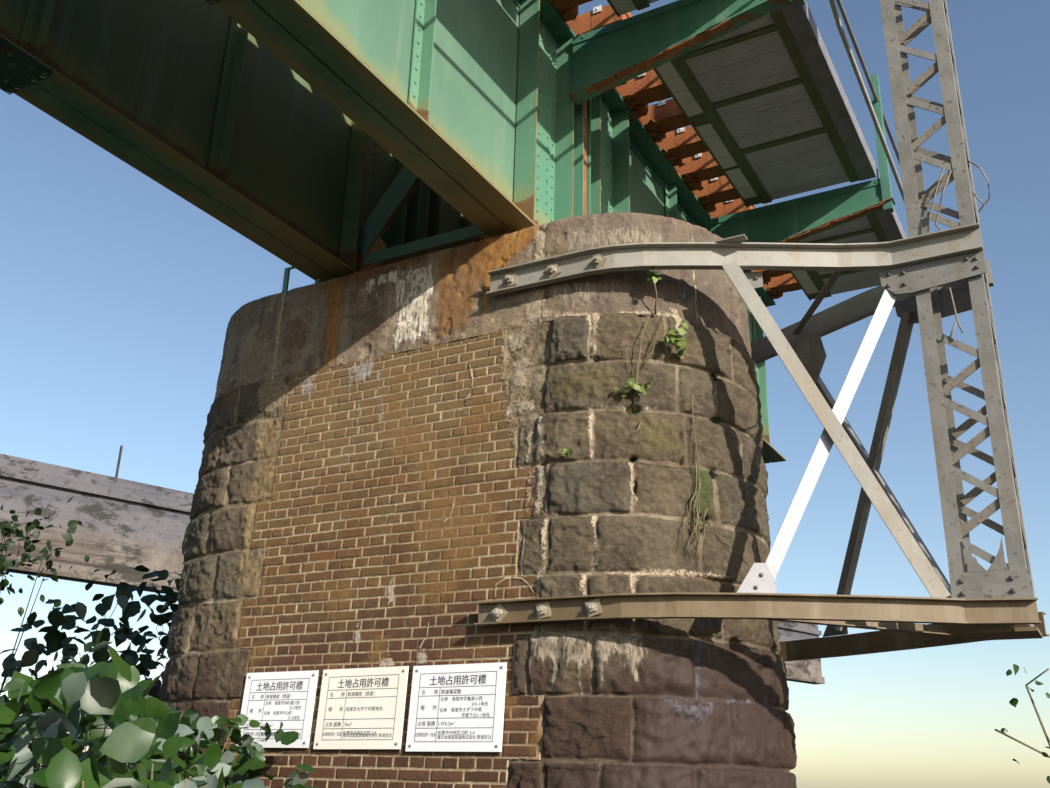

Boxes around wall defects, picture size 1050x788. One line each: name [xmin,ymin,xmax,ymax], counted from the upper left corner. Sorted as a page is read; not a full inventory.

rust [584,19,733,94]
efflorescence [366,264,434,351]
rust [439,224,538,335]
water stain [527,625,791,788]